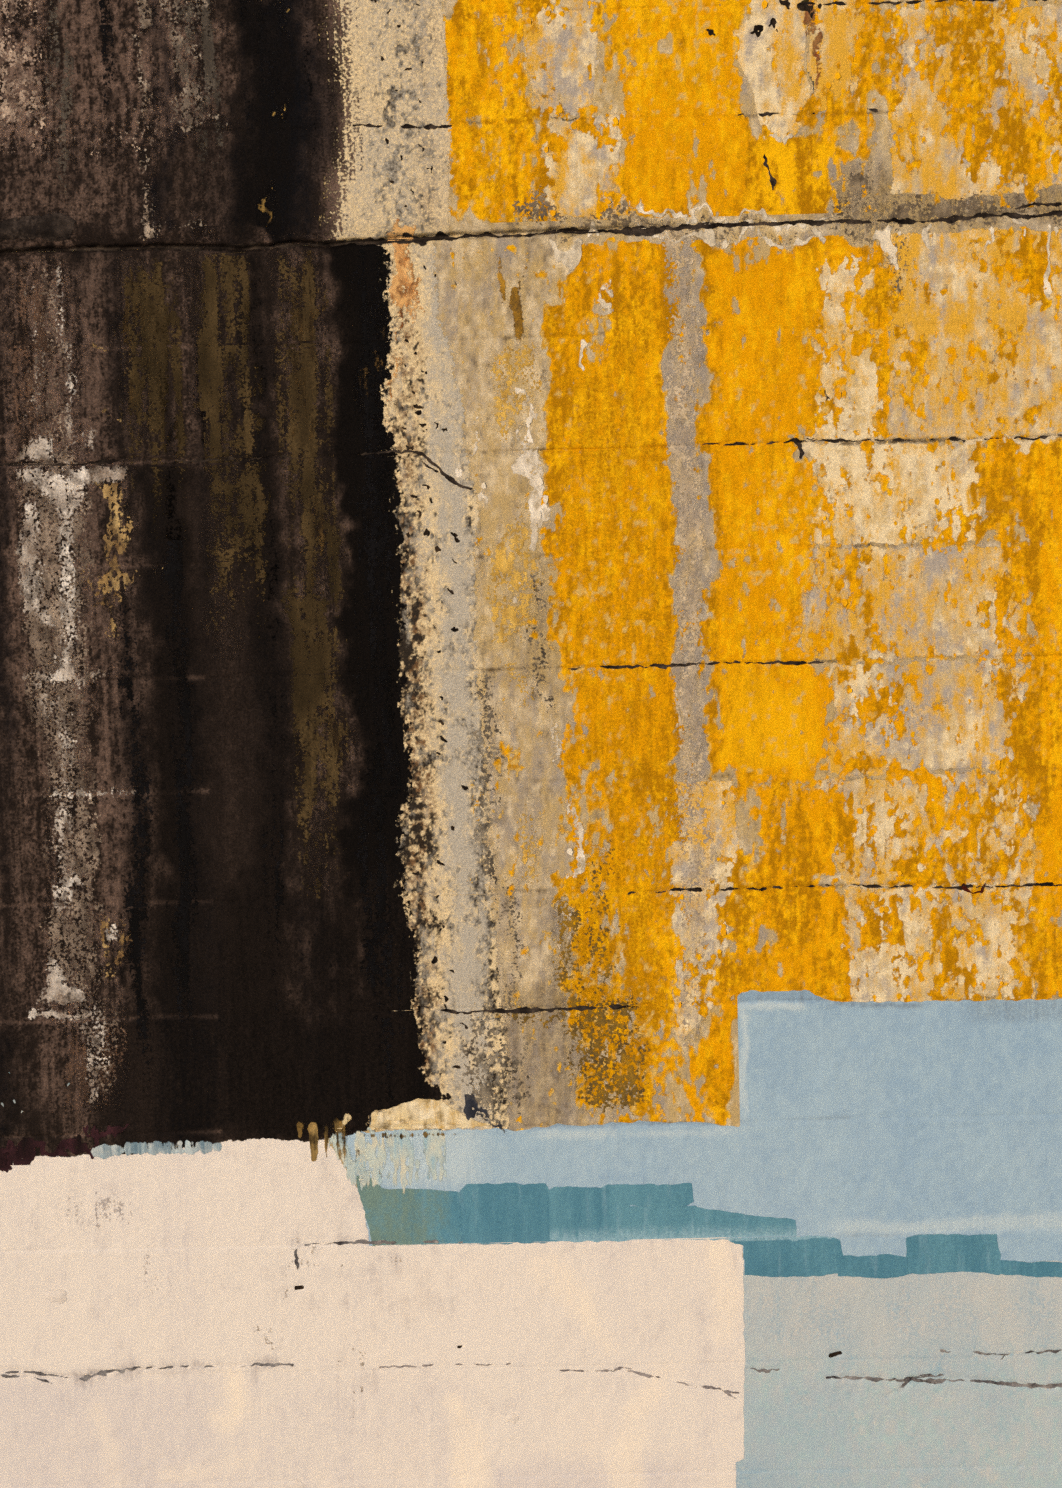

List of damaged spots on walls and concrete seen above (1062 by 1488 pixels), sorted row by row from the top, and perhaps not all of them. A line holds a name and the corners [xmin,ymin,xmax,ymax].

crack [0,154,1062,253]
peeling [522,0,634,219]
crack [737,110,815,118]
peeling [733,0,1062,200]
water stain [0,0,650,1193]
spalling [324,0,551,1131]
peeling [797,228,1062,1003]
peeling [565,800,585,879]
peeling [665,780,739,1045]
crack [1,1363,294,1384]
crack [379,1363,779,1399]
crack [826,1349,1062,1389]